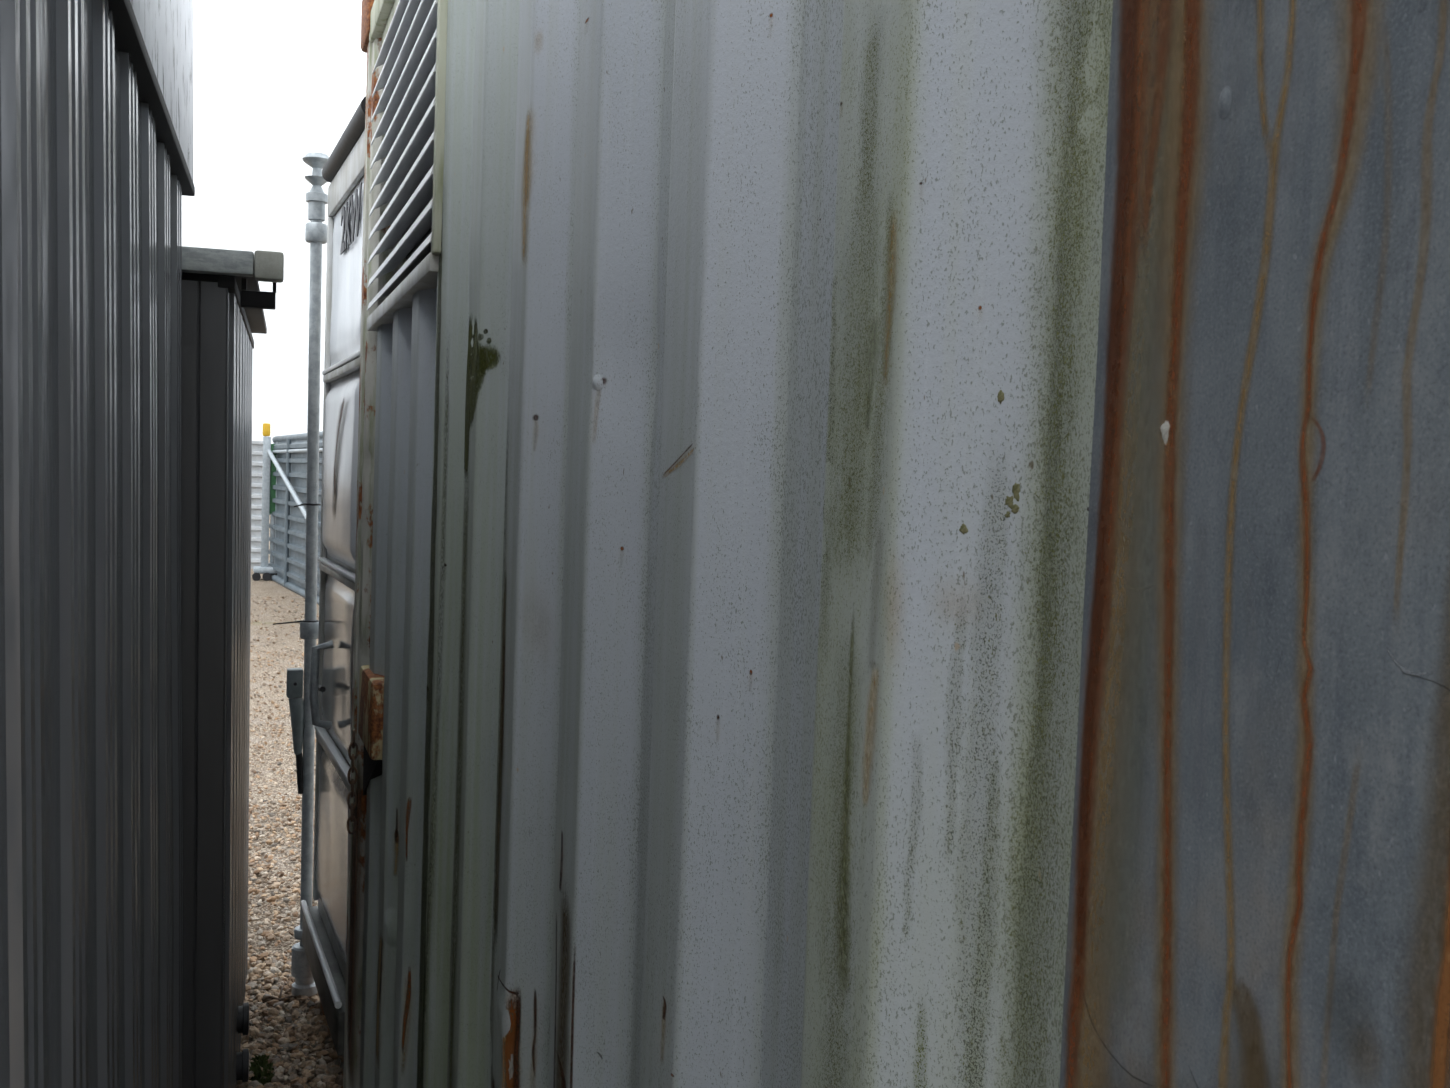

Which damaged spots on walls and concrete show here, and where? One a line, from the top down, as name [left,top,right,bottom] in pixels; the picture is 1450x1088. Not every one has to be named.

corrosion [1066,0,1202,1088]
corrosion [1284,0,1373,1088]
corrosion [493,972,536,1088]
corrosion [554,833,575,1088]
corrosion [1417,681,1450,1088]